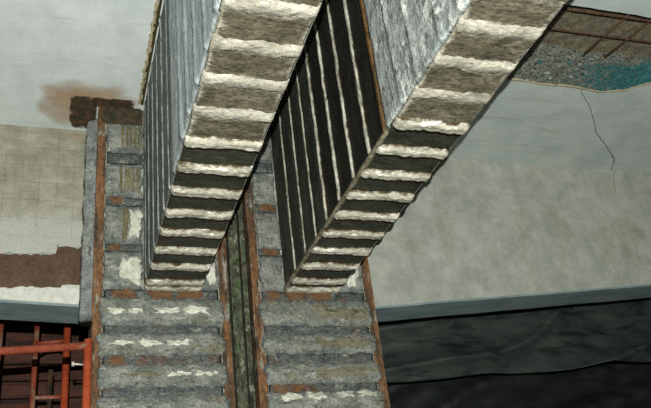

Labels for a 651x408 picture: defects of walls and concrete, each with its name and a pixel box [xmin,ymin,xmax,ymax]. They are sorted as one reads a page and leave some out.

spalling [506,5,651,93]
corrosion [49,88,142,128]
crack [581,90,616,193]
peeling [0,244,81,304]